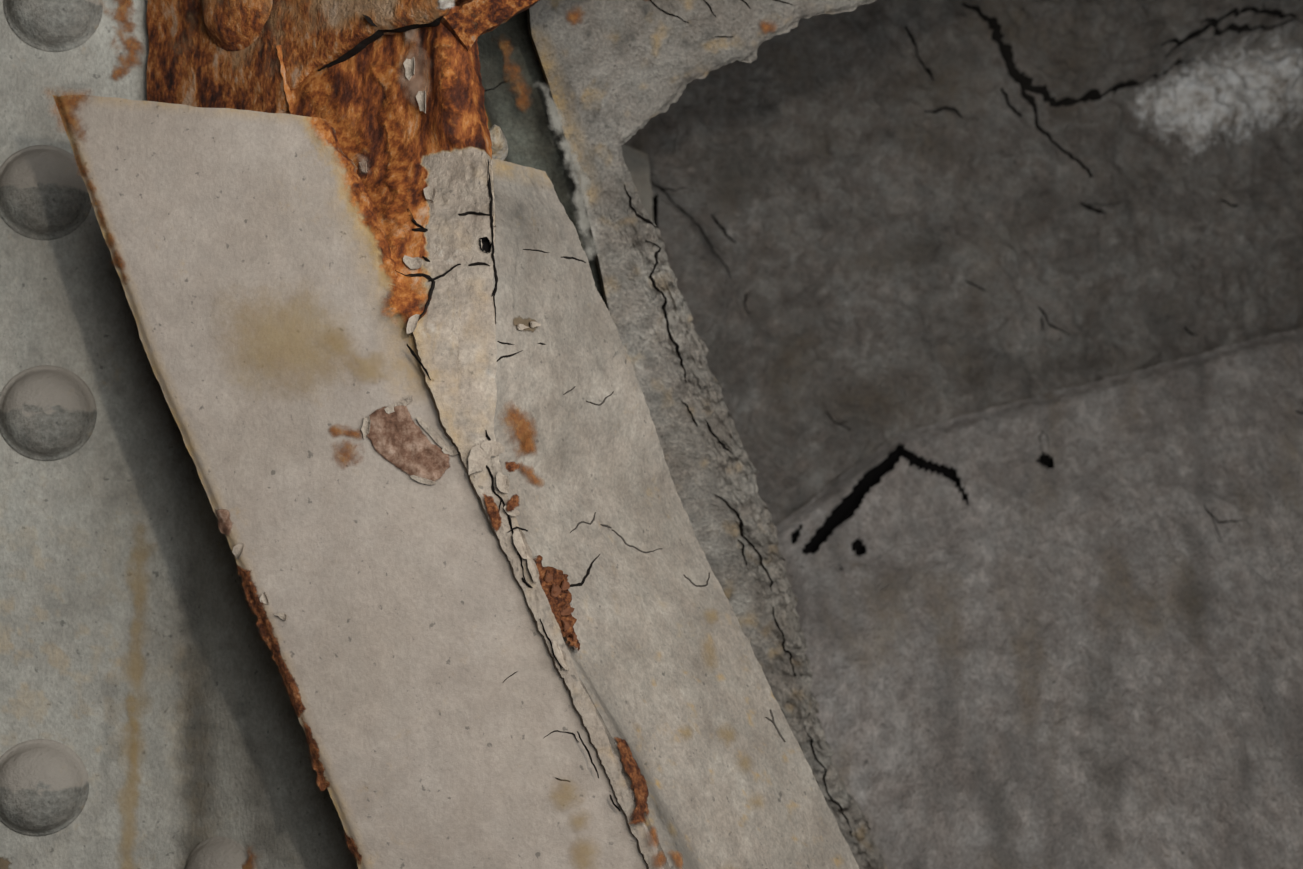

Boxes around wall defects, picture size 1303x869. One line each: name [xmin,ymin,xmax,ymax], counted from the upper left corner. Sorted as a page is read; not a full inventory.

rust [54,93,126,280]
rust [112,0,141,79]
rust [296,64,428,321]
rust [434,32,463,149]
crack [395,160,586,380]
crack [624,178,750,454]
crack [960,3,1297,214]
spalling [361,395,458,485]
crack [468,430,539,588]
crack [570,512,663,587]
crack [799,442,971,555]
rust [215,509,330,791]